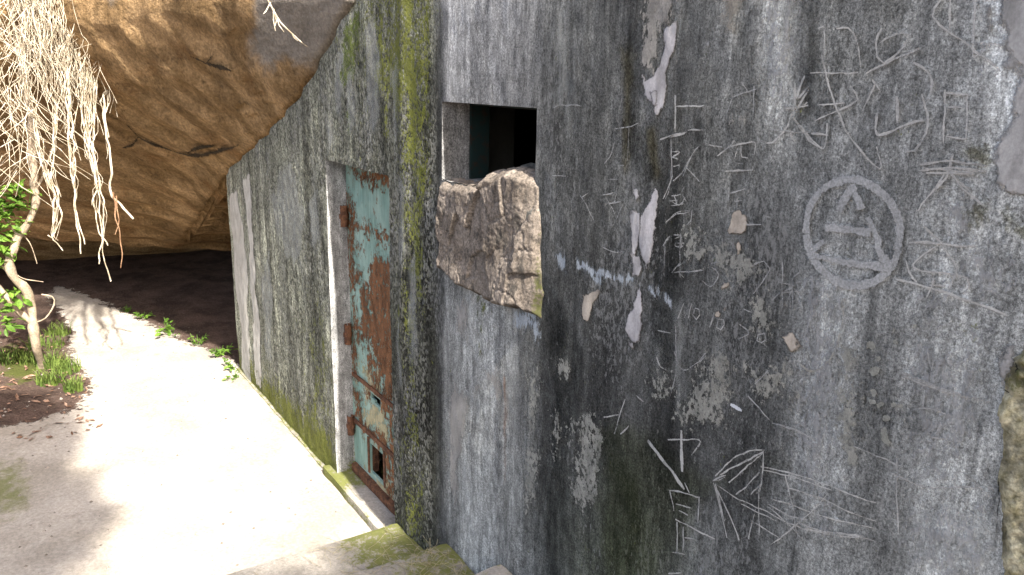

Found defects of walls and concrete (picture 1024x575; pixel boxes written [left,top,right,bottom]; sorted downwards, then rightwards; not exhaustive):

peeling [640,0,682,115]
peeling [986,0,1024,195]
corrosion [346,166,394,499]
leakage [394,174,421,389]
spalling [582,289,600,321]
peeling [625,188,659,349]